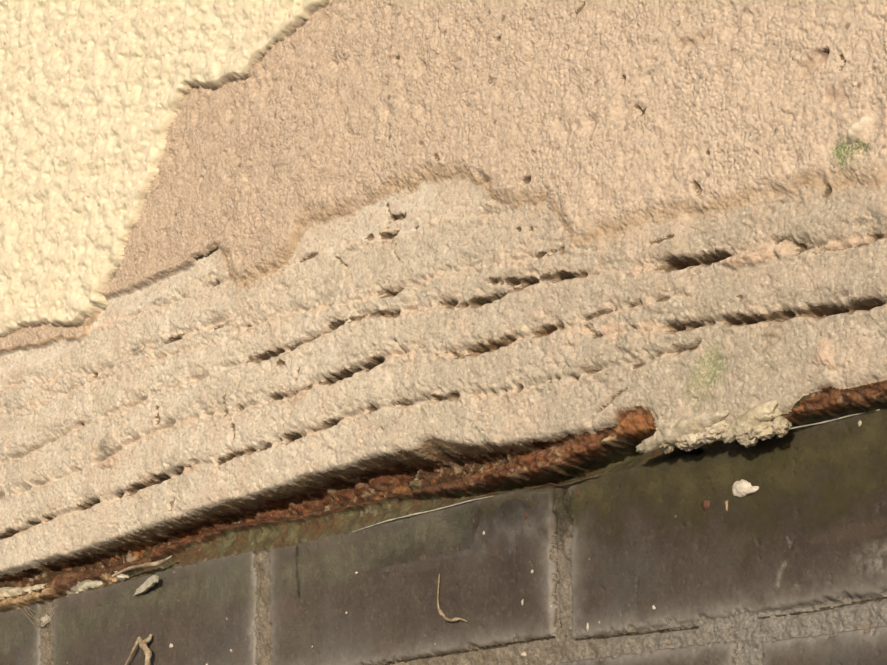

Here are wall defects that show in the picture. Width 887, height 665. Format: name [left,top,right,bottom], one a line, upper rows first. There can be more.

spalling [676,26,714,53]
spalling [795,46,829,82]
flaking render [0,177,887,578]
rust [615,411,655,440]
water stain [560,400,887,526]